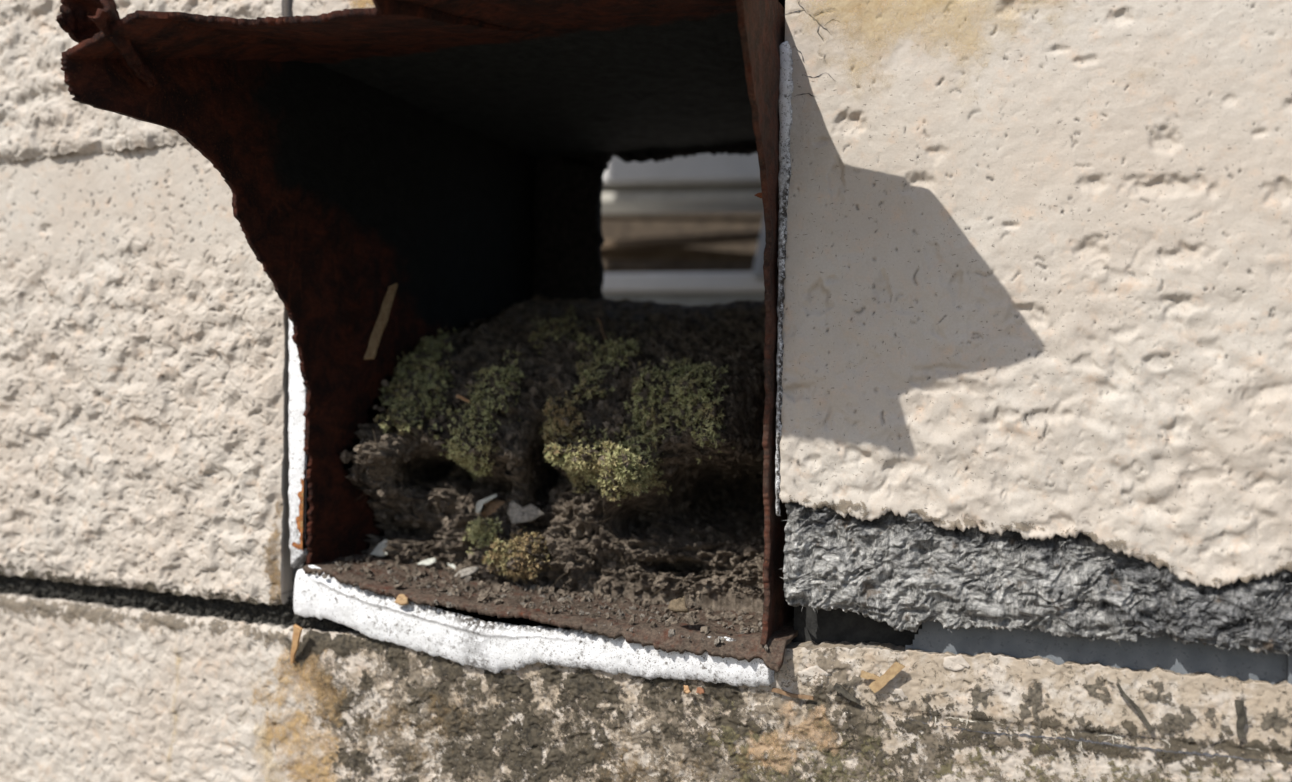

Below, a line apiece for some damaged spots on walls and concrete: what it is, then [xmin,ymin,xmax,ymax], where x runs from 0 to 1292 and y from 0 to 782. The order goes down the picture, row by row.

rust [352,0,374,8]
rust [292,470,307,551]
water stain [788,495,891,519]
spalling [783,502,1292,654]
water stain [0,502,1292,782]